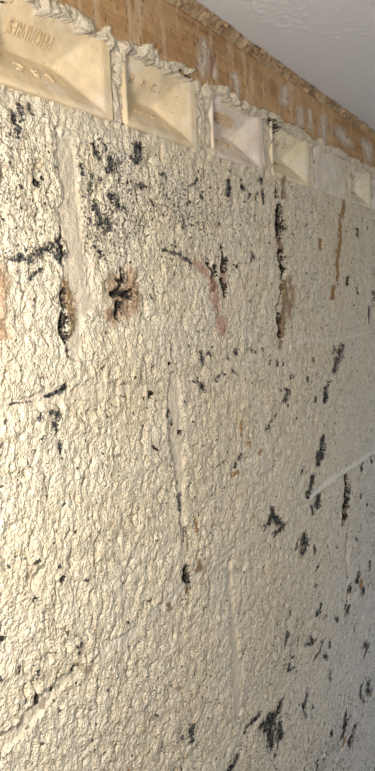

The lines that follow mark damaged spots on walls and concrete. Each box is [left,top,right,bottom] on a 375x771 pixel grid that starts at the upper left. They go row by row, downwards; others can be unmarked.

flaking render [166,0,375,138]